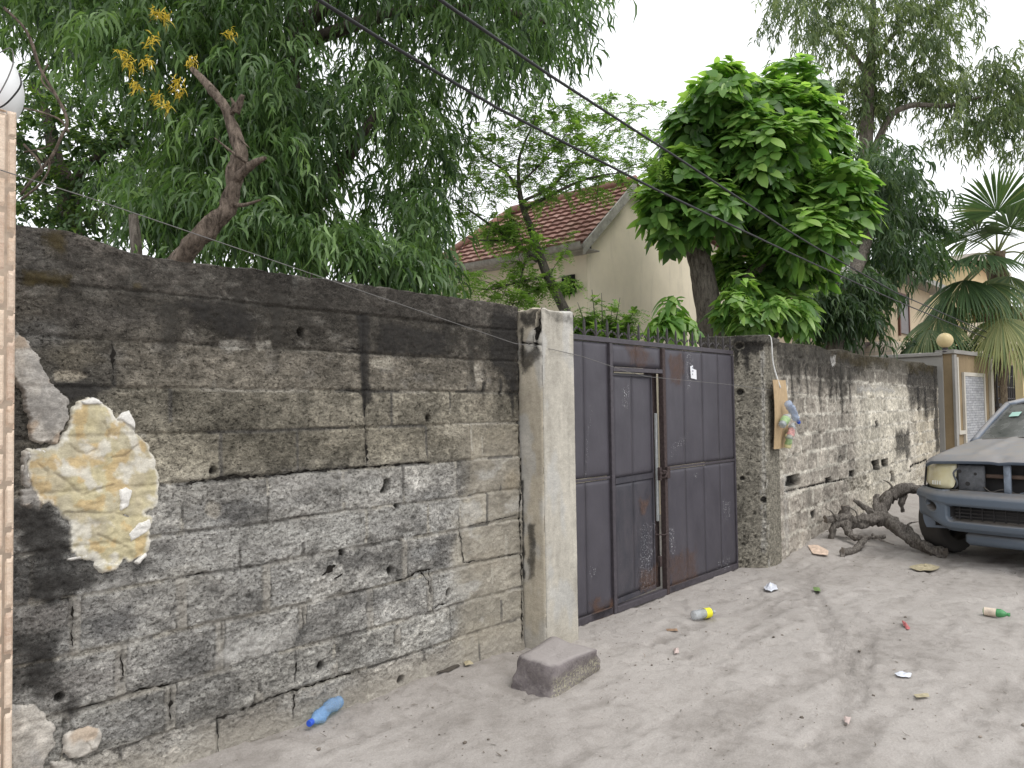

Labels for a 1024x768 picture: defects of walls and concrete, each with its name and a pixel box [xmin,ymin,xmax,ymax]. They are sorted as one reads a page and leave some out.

peeling [14,330,160,574]
water stain [346,307,455,409]
spalling [534,309,542,342]
water stain [734,336,764,371]
water stain [777,345,893,411]
water stain [896,430,910,457]
water stain [907,365,940,450]
water stain [17,503,92,604]
water stain [521,480,535,579]
water stain [17,635,80,715]